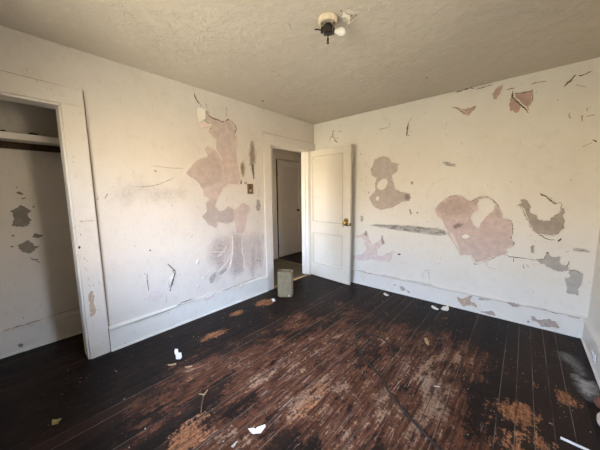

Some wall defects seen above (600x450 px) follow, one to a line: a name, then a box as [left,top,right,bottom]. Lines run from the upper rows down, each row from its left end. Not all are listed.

peeling [451,105,477,117]
peeling [509,89,533,113]
peeling [185,108,260,234]
peeling [361,155,418,215]
peeling [9,187,34,228]
peeling [16,232,44,254]
peeling [352,230,398,262]
peeling [427,194,517,265]
peeling [515,197,568,240]
peeling [529,244,585,296]
peeling [87,285,98,318]